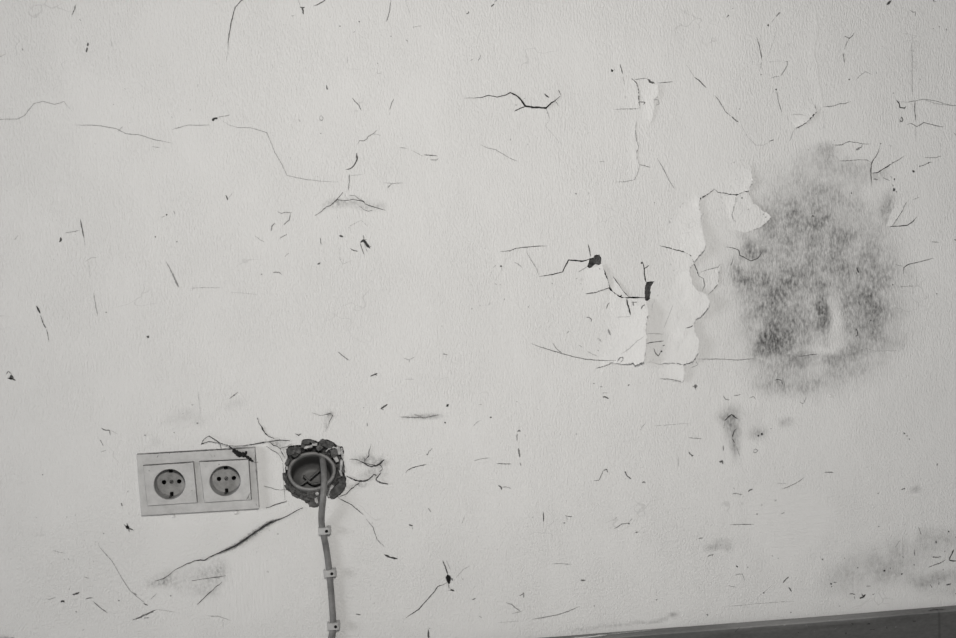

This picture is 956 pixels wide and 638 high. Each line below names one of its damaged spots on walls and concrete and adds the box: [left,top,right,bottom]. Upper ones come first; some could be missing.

crack [477,87,561,111]
peeling [624,78,666,127]
crack [539,245,591,277]
peeling [580,158,771,382]
damp [757,271,813,354]
flaking render [283,439,346,508]